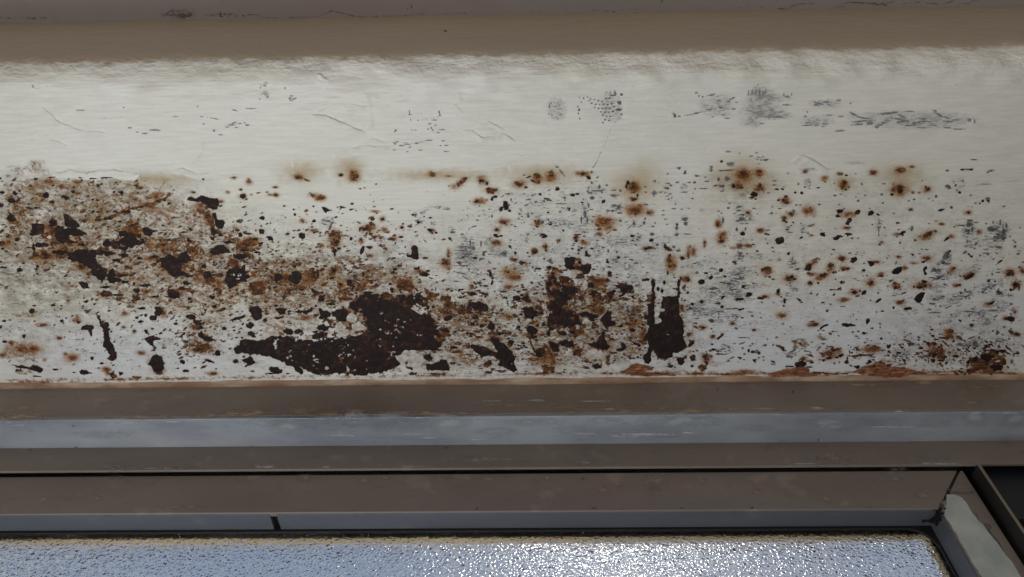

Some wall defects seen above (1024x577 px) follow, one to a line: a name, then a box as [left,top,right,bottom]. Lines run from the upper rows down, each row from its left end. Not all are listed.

rust [0,166,1024,383]
peeling [337,313,366,336]
peeling [390,350,429,376]